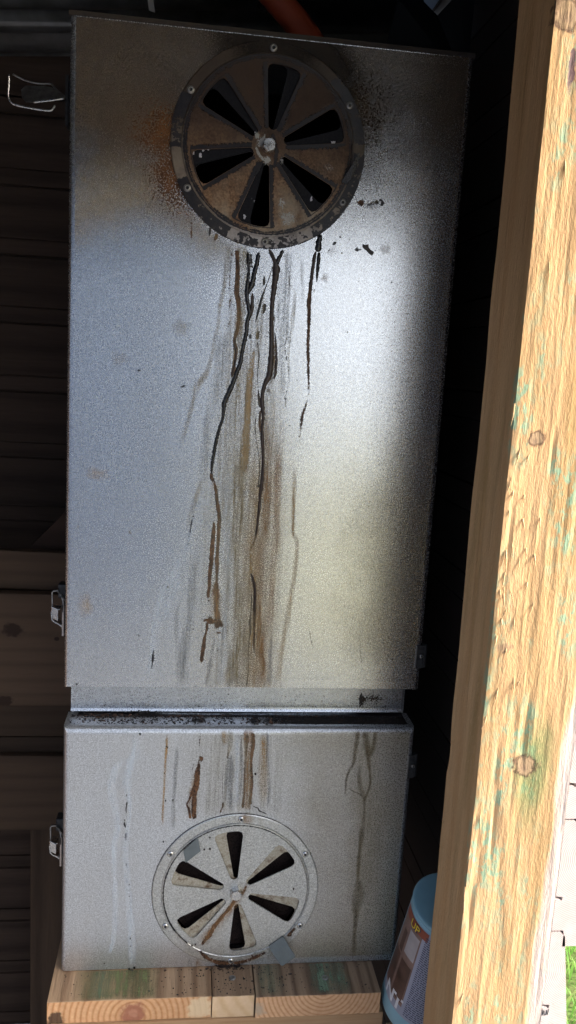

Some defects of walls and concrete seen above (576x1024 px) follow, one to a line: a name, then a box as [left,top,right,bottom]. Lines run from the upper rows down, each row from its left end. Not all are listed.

corrosion [116,86,218,241]
corrosion [231,249,255,474]
corrosion [193,468,228,662]
corrosion [248,434,279,677]
corrosion [151,732,316,968]